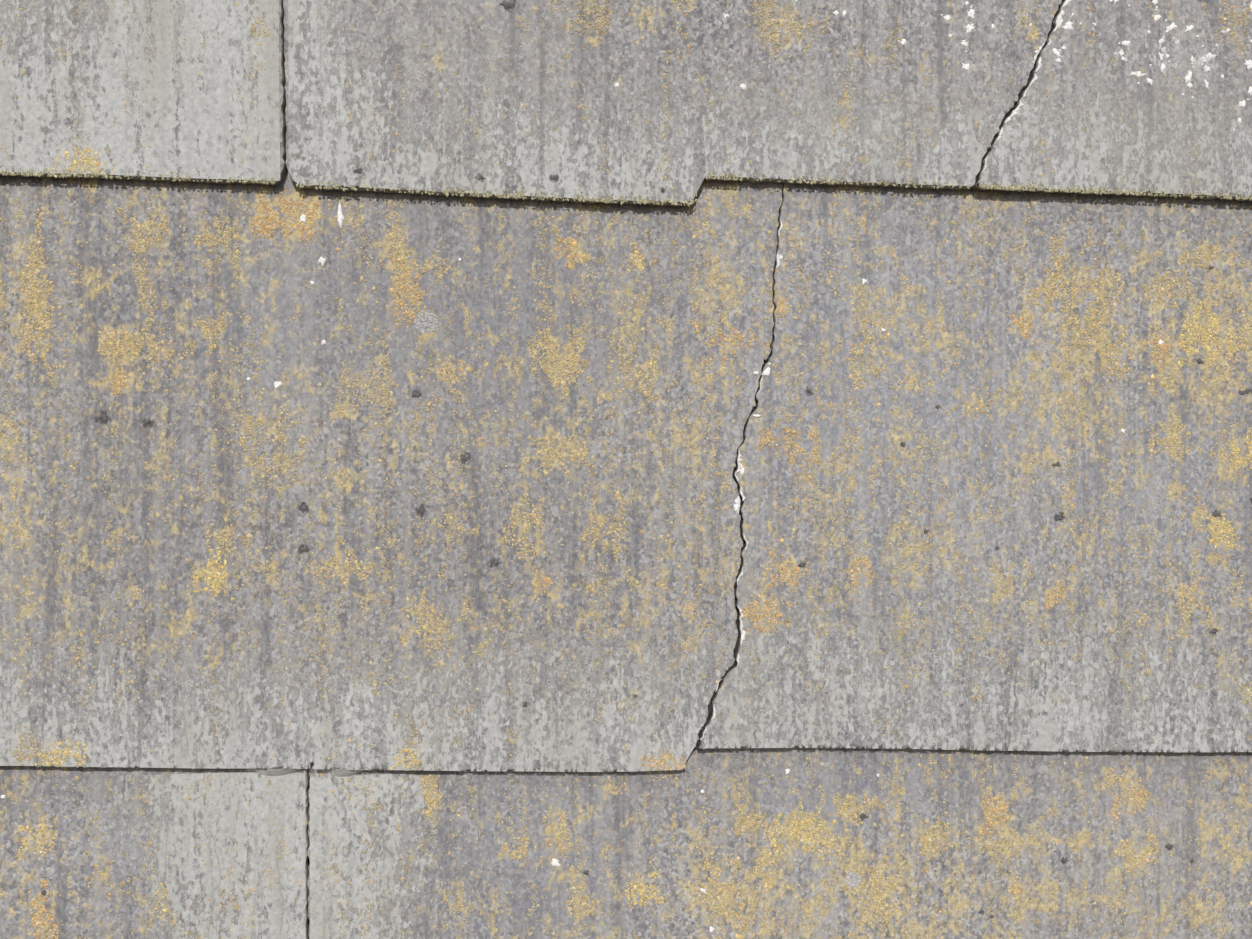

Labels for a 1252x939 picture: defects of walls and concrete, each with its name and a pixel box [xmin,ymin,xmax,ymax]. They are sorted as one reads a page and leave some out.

crack [971,0,1072,189]
crack [695,188,783,748]